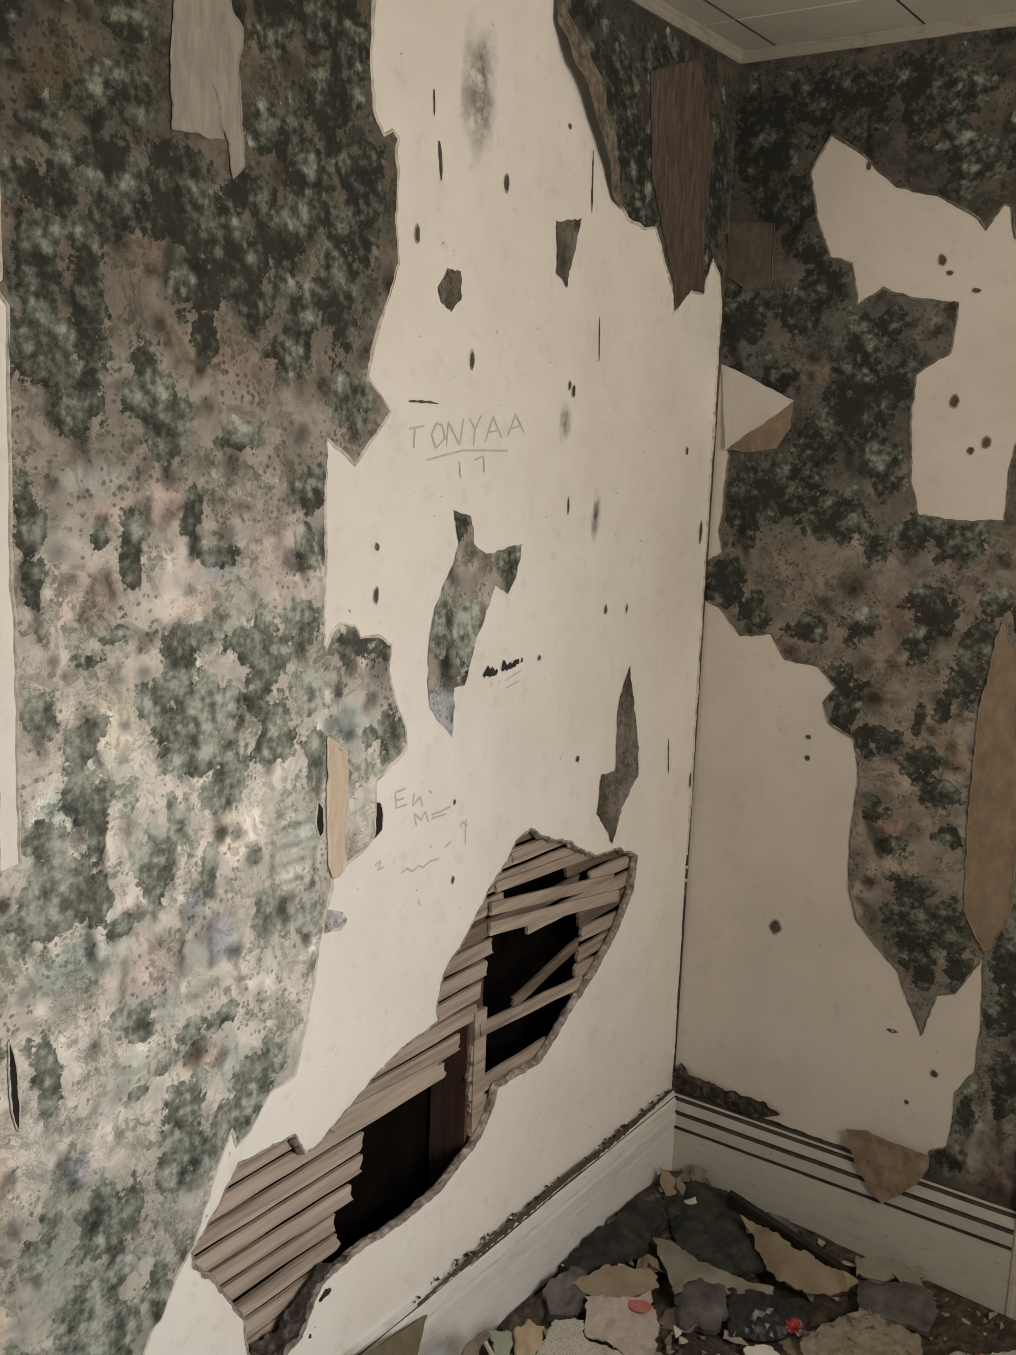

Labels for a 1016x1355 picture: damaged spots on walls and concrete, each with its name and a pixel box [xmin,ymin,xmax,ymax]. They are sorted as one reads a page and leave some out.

peeling [0,190,22,874]
peeling [143,0,722,1355]
peeling [708,365,730,560]
peeling [675,600,985,1160]
peeling [810,133,1016,523]